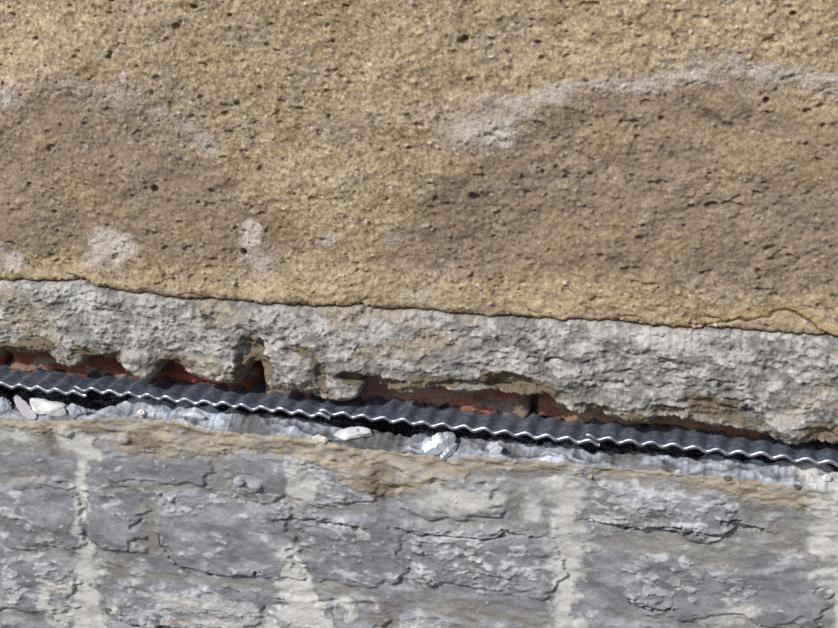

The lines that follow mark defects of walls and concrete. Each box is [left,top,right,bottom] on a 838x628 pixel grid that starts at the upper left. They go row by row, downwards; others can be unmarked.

water stain [446,52,838,151]
water stain [85,228,139,270]
water stain [239,217,276,284]
flaking render [0,337,140,380]
flaking render [152,335,771,439]
crack [692,304,826,333]
spalling [804,421,838,442]
water stain [0,428,121,628]
water stain [141,543,358,628]
water stain [411,482,508,518]
water stain [520,465,601,628]
water stain [785,461,838,628]